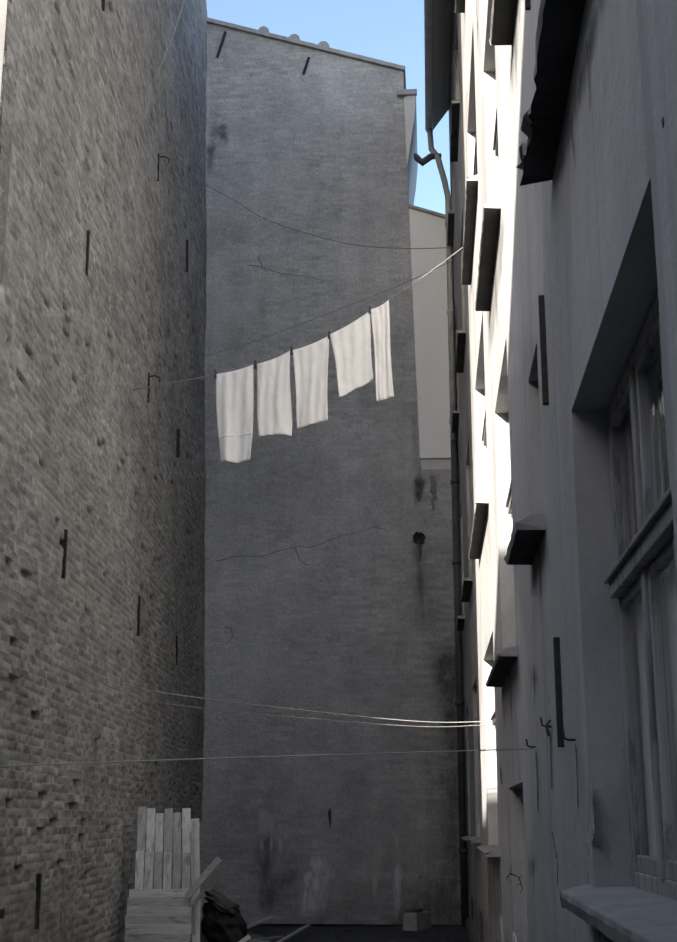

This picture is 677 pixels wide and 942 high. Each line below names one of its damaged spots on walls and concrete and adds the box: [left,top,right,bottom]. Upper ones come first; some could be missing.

crack [430,475,438,511]
crack [216,515,408,566]
crack [506,865,523,893]